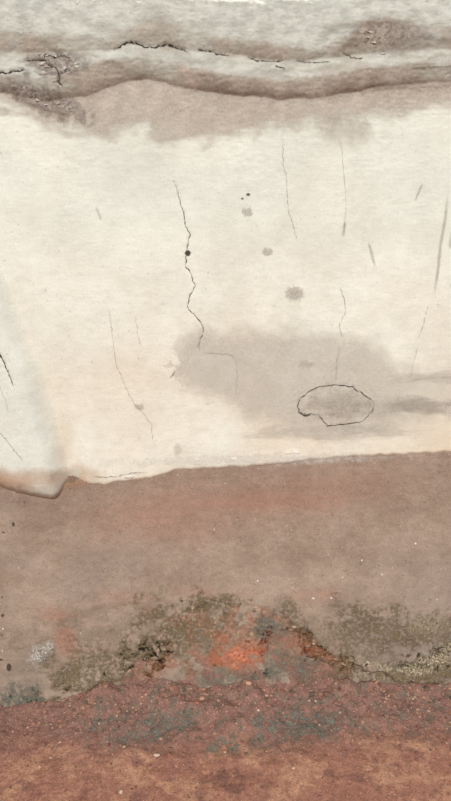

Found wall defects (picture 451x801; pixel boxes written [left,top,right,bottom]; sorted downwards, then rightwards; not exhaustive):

crack [0,54,69,86]
crack [114,41,228,56]
leakage [12,66,451,140]
crack [248,53,361,68]
crack [177,190,236,361]
leakage [176,335,408,428]
crack [297,287,375,427]
spalling [64,601,352,701]